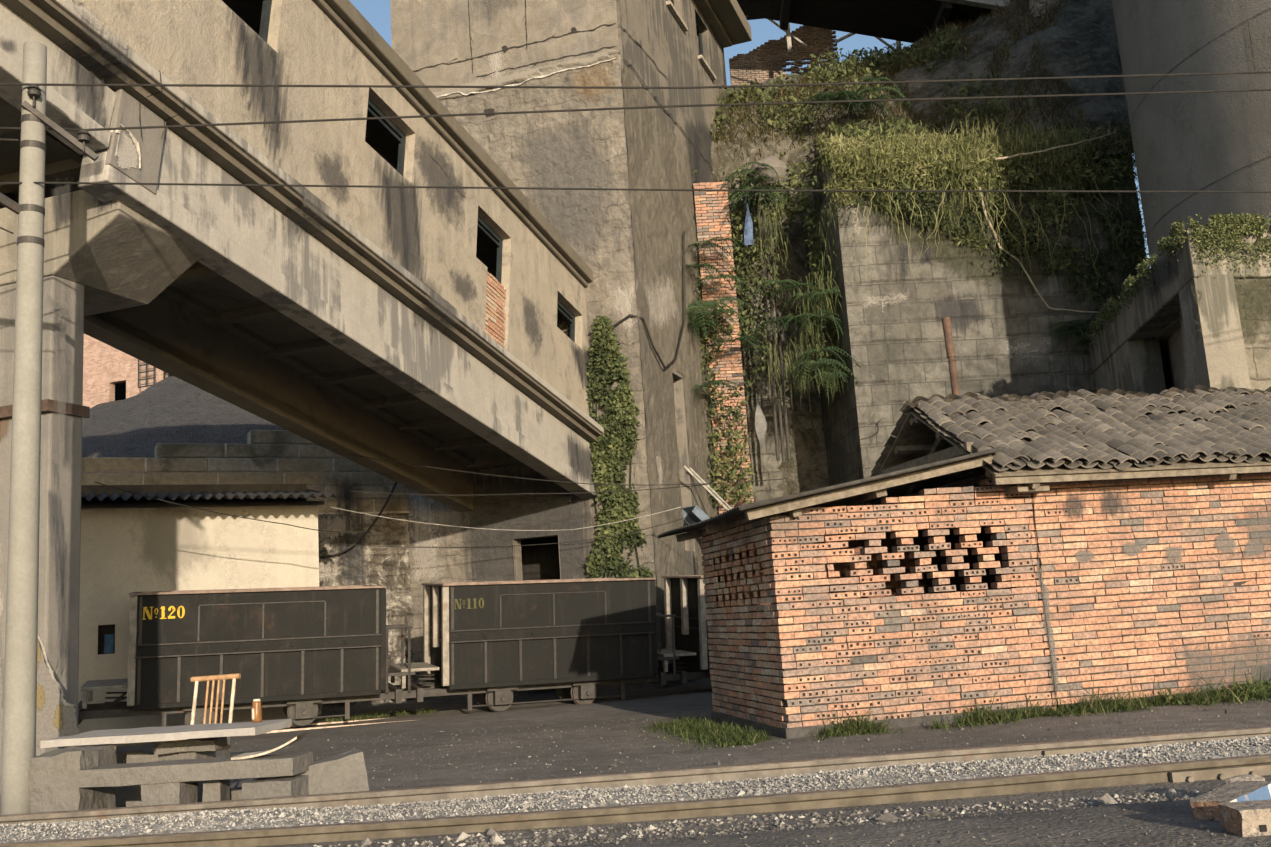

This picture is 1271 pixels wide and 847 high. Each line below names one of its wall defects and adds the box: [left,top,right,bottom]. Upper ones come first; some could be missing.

leakage [237,20,285,153]
crack [1130,8,1270,127]
leakage [320,158,345,200]
leakage [377,142,464,276]
leakage [455,276,475,299]
leakage [319,476,353,578]
peeling [36,634,80,747]